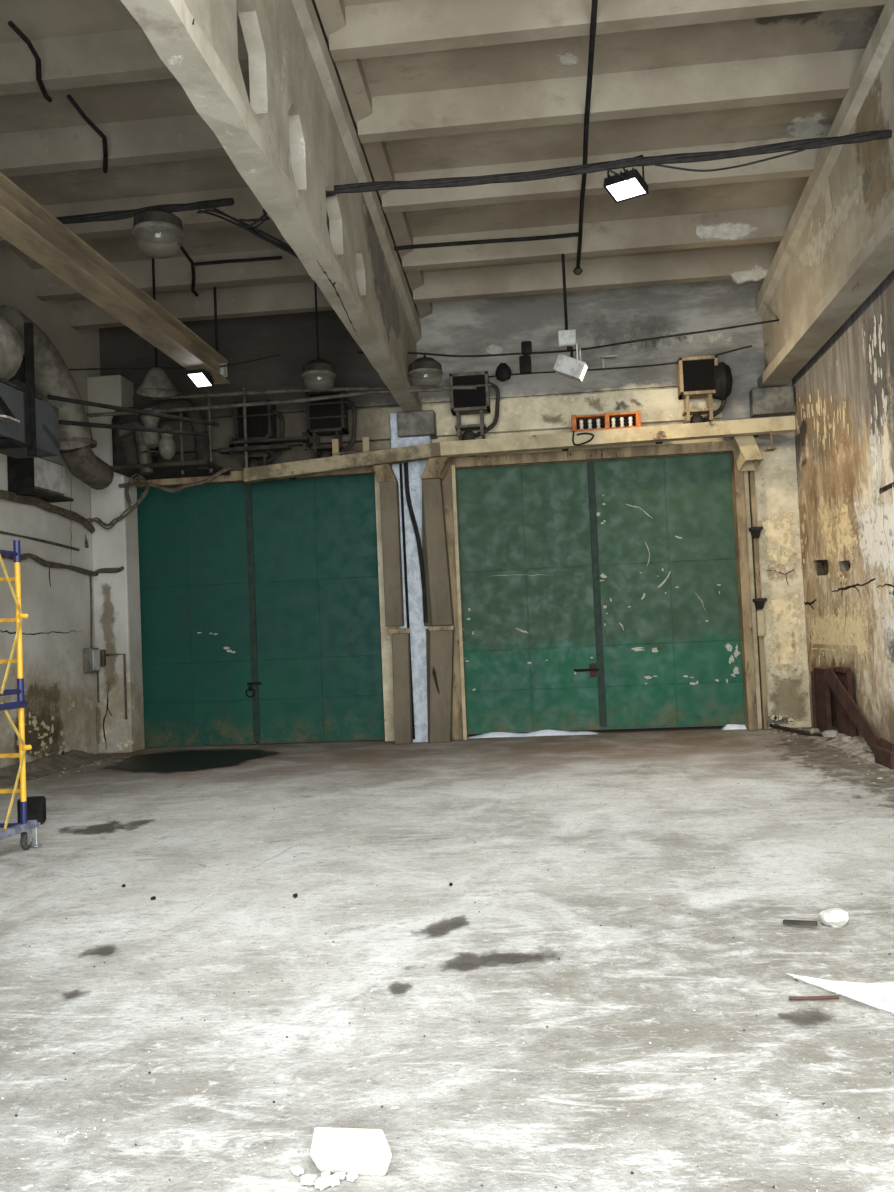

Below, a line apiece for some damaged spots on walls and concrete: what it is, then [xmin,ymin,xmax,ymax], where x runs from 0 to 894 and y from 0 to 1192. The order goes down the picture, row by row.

peeling [758,314,894,702]
crack [766,570,894,663]
peeling [715,643,740,683]
peeling [15,712,70,763]
damp [105,749,276,773]